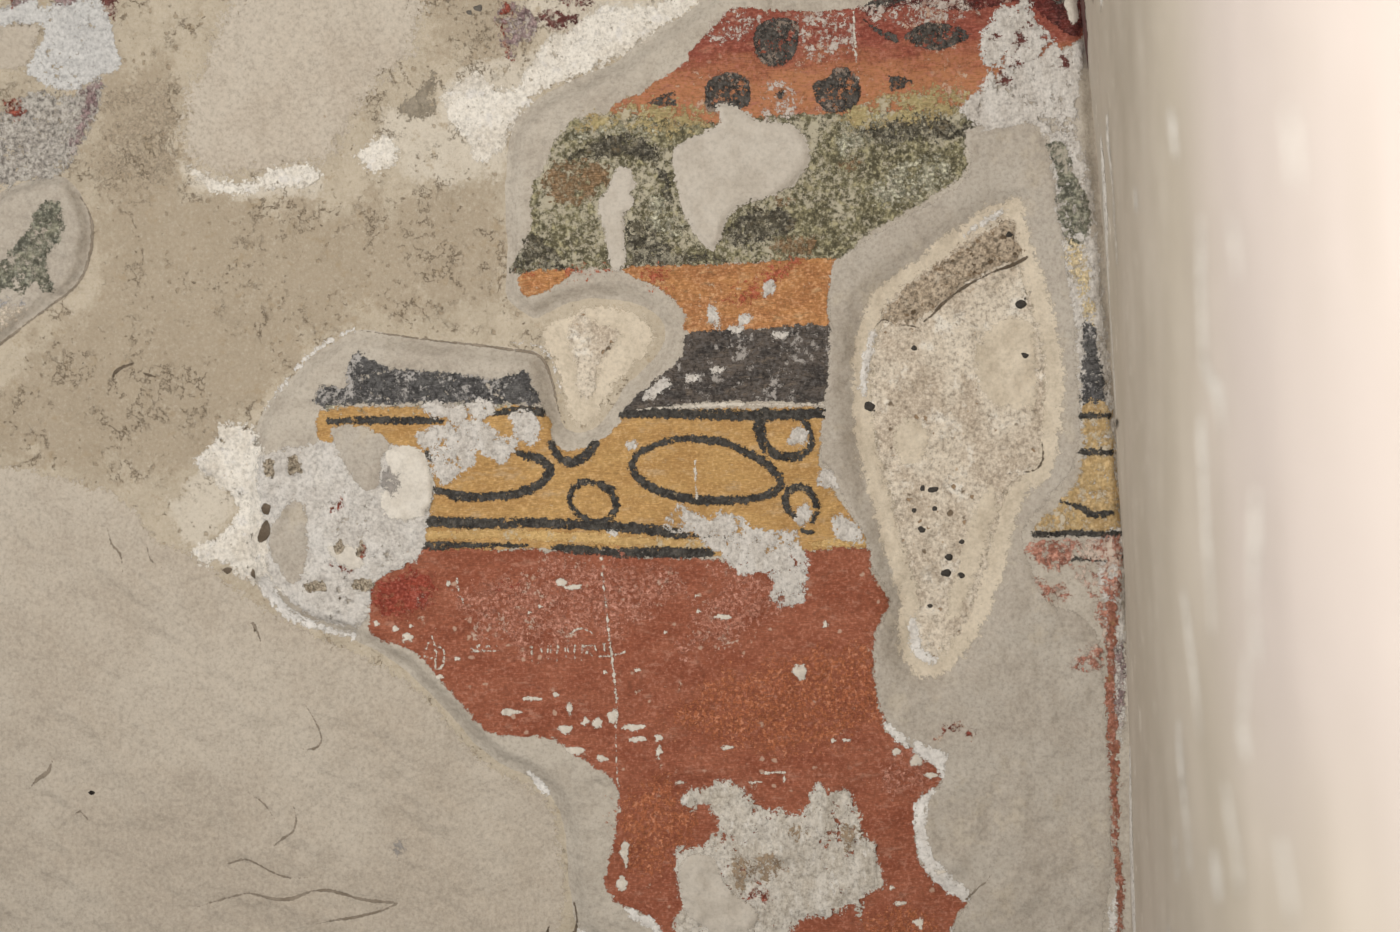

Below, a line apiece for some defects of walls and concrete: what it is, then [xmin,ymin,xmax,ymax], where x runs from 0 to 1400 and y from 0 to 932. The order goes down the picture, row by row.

spalling [537,303,657,427]
spalling [849,195,1068,681]
spalling [190,420,437,643]
peeling [556,577,581,590]
peeling [791,664,807,681]
peeling [501,692,663,762]
peeling [892,748,938,779]
peeling [616,841,630,891]
spalling [672,771,907,932]